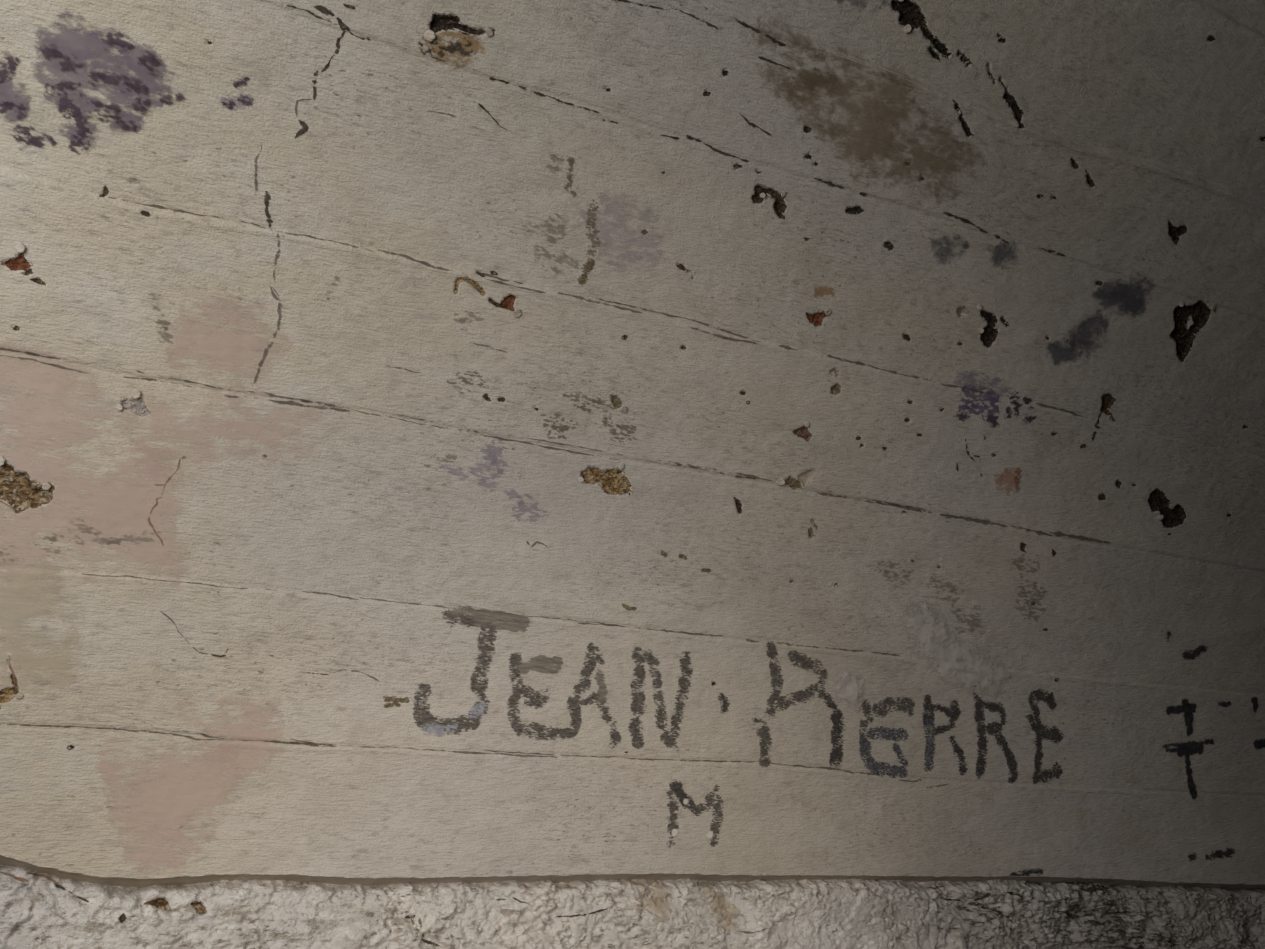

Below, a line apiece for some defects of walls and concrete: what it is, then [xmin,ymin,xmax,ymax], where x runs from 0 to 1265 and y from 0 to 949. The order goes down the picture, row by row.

crack [614,0,791,69]
damp [0,14,184,154]
crack [286,3,370,138]
crack [430,77,618,130]
spalling [752,171,787,219]
crack [108,146,798,481]
spalling [977,304,1009,347]
spalling [1170,301,1216,362]
spalling [0,456,54,513]
spalling [577,462,634,497]
crack [819,493,1110,543]
spalling [1148,489,1186,535]